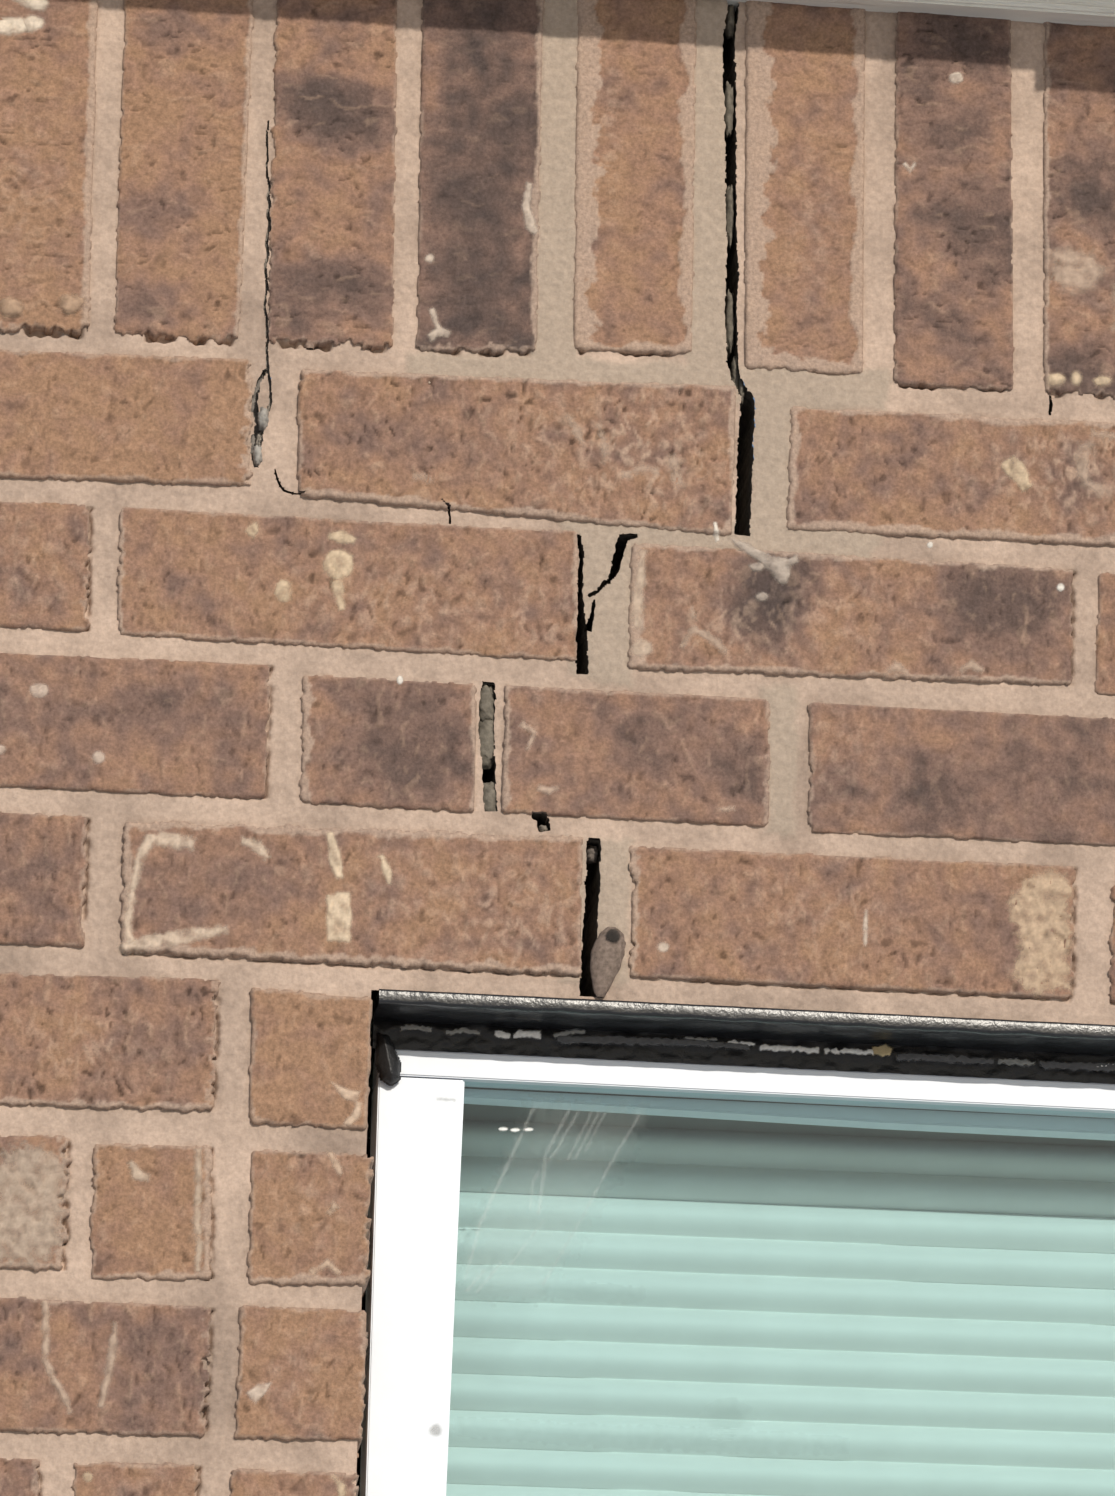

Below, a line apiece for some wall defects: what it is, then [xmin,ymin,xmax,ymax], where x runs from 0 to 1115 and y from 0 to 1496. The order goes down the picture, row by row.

crack [575,535,637,674]
crack [478,683,551,832]
crack [579,839,601,997]